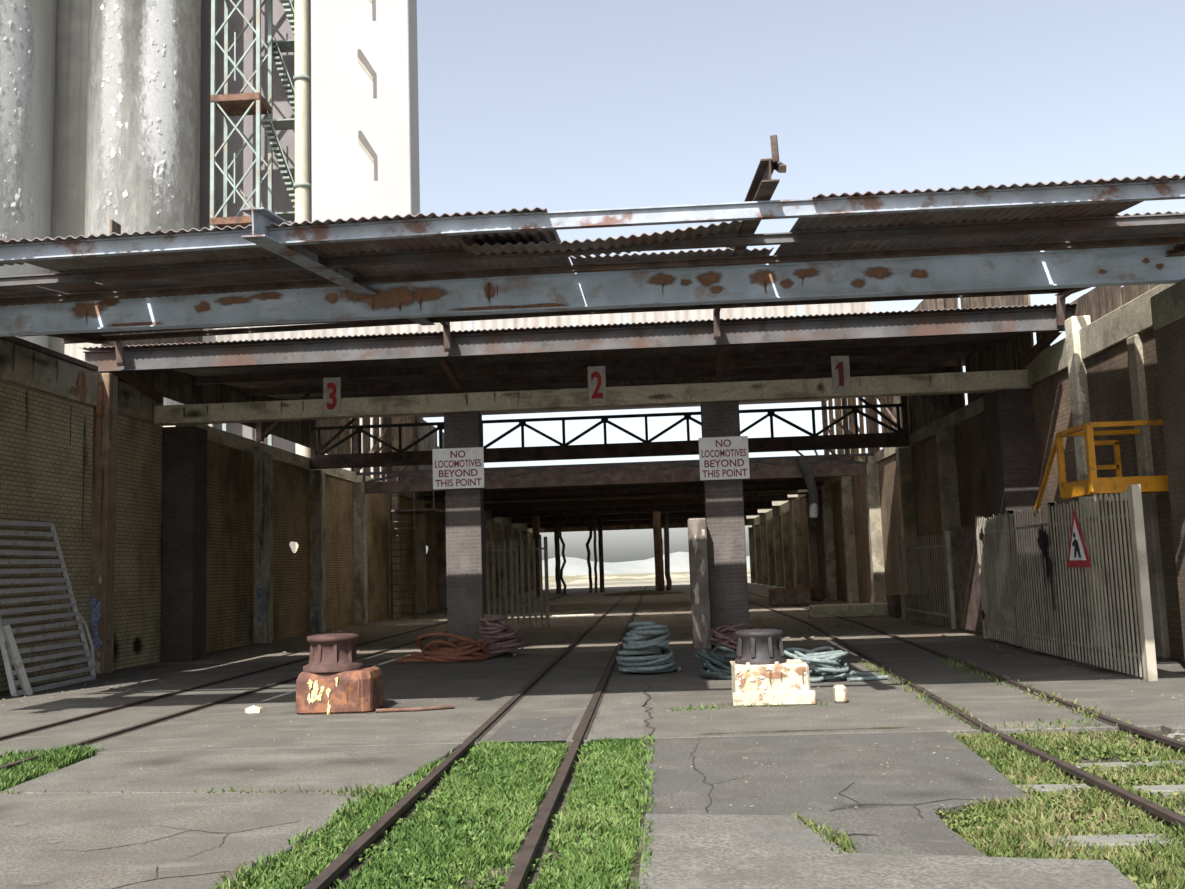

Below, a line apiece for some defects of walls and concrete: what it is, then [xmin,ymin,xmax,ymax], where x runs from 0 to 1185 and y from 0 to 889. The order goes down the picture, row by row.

peeling [0,0,33,240]
peeling [97,0,181,229]
rust [649,271,723,294]
rust [750,269,819,294]
rust [851,267,892,288]
rust [911,270,928,278]
rust [72,299,119,323]
rust [196,292,282,313]
rust [325,286,446,312]
rust [455,283,566,311]